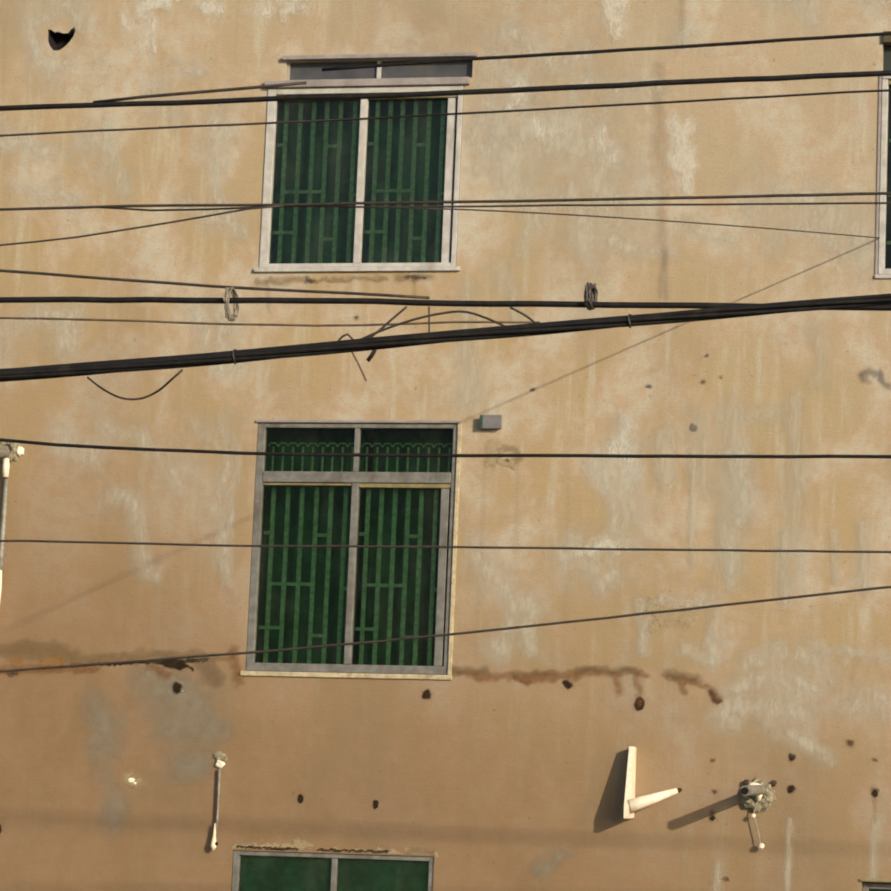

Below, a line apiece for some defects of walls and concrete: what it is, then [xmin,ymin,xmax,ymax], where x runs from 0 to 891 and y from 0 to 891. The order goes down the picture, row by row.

spalling [48,27,75,54]
rust [163,659,186,670]
rust [635,697,645,710]
spalling [233,839,438,858]